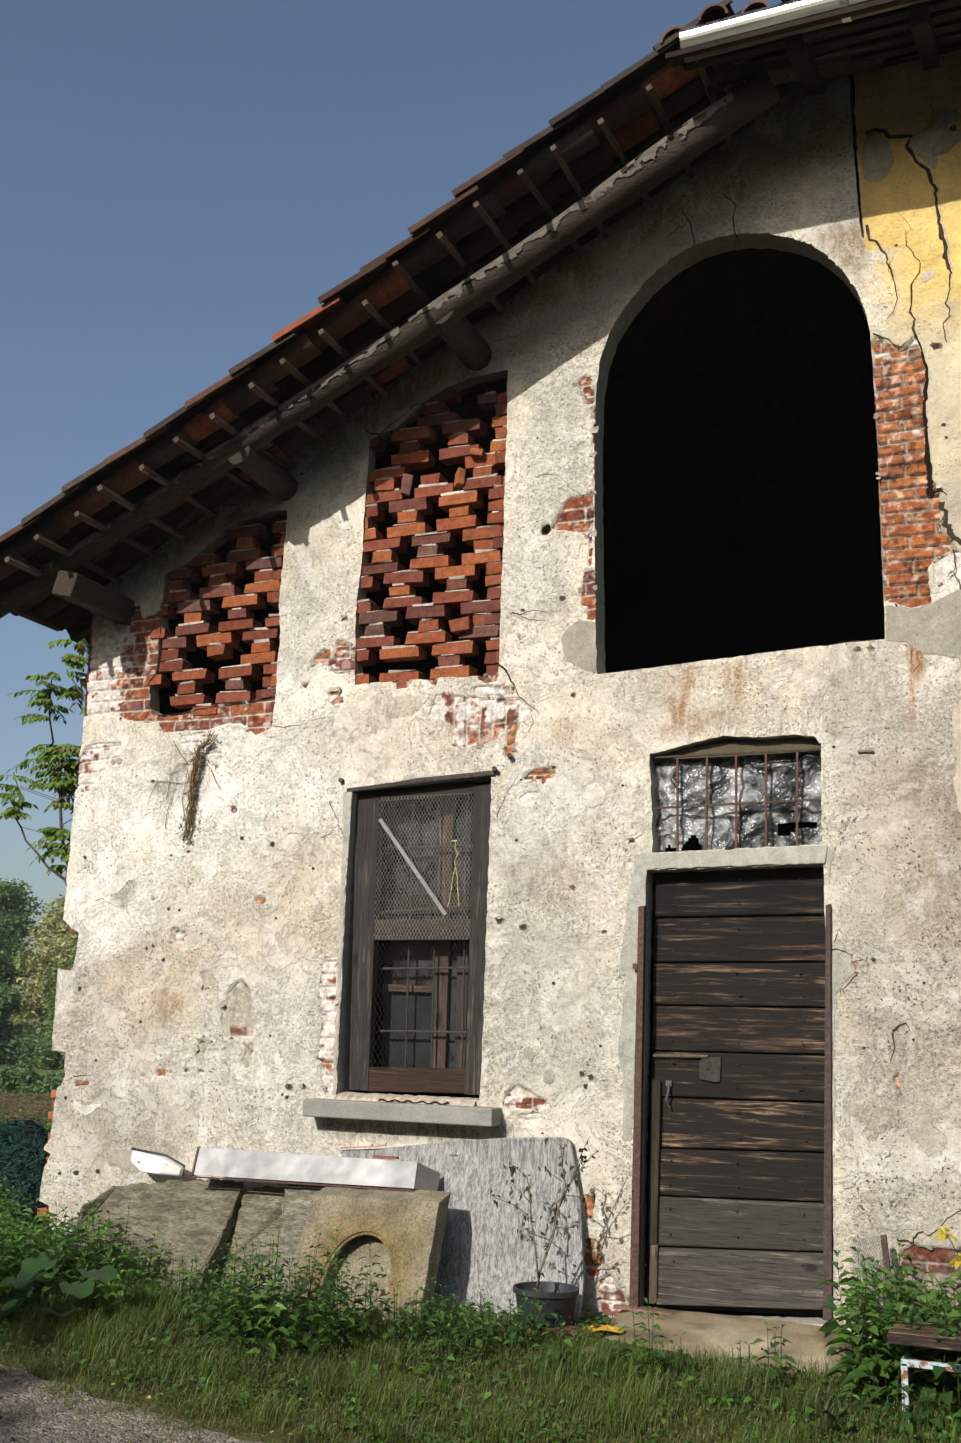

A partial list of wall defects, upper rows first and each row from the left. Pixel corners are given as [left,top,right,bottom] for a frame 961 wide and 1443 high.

crack [849,75,961,590]
spalling [541,377,599,622]
spalling [871,338,961,608]
spalling [82,606,276,769]
spalling [393,672,532,757]
spalling [316,957,338,1092]
flaking render [504,1085,547,1120]
spalling [585,1196,595,1219]
flaking render [583,1236,629,1316]